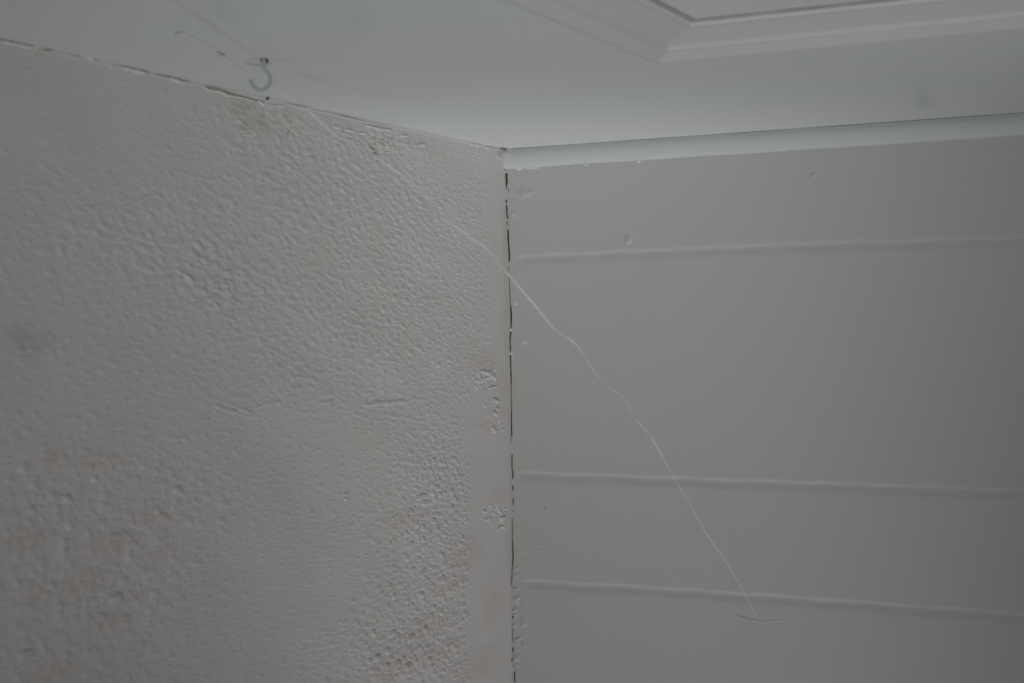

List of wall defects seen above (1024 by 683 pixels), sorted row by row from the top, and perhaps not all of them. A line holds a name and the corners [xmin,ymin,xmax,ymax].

crack [500,147,514,586]